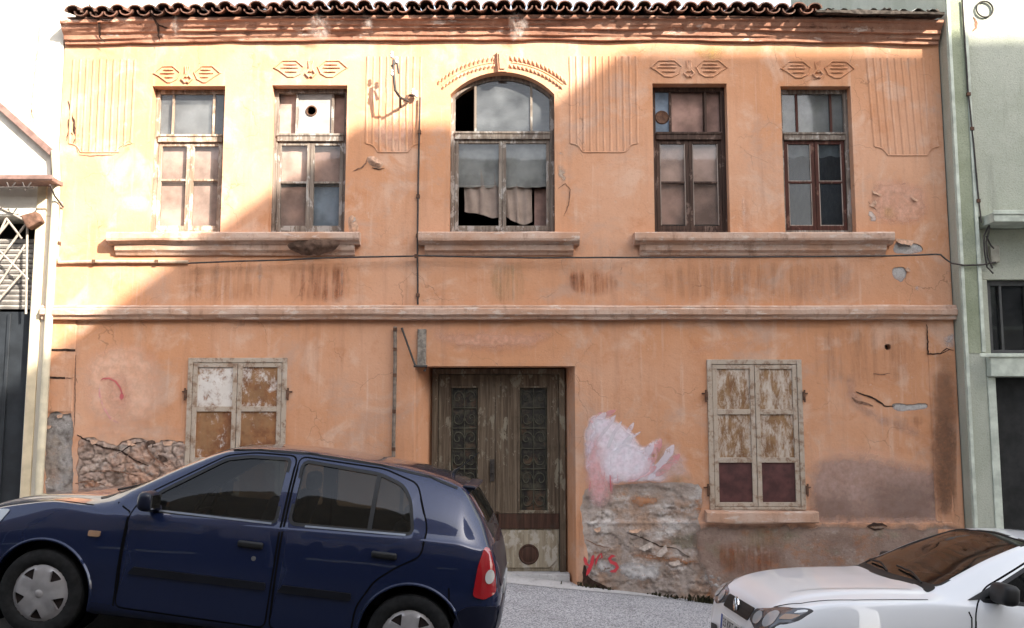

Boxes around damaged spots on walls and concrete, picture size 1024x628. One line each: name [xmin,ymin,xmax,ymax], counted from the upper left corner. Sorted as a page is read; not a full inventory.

peeling [892,267,911,282]
peeling [893,238,923,254]
crack [926,324,953,355]
flaking render [45,411,185,493]
damp [814,460,936,521]
flaking render [580,482,956,601]